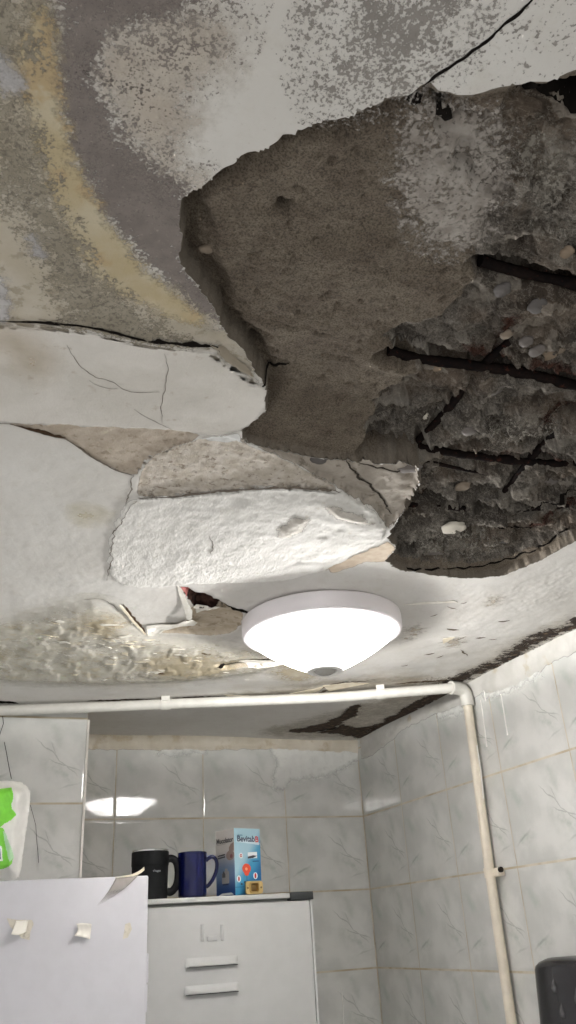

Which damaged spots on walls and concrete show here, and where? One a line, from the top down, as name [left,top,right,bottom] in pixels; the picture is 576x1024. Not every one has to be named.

crack [425,0,533,85]
damp [0,0,273,371]
spalling [0,0,576,579]
peeling [0,586,369,694]
damp [289,617,576,738]